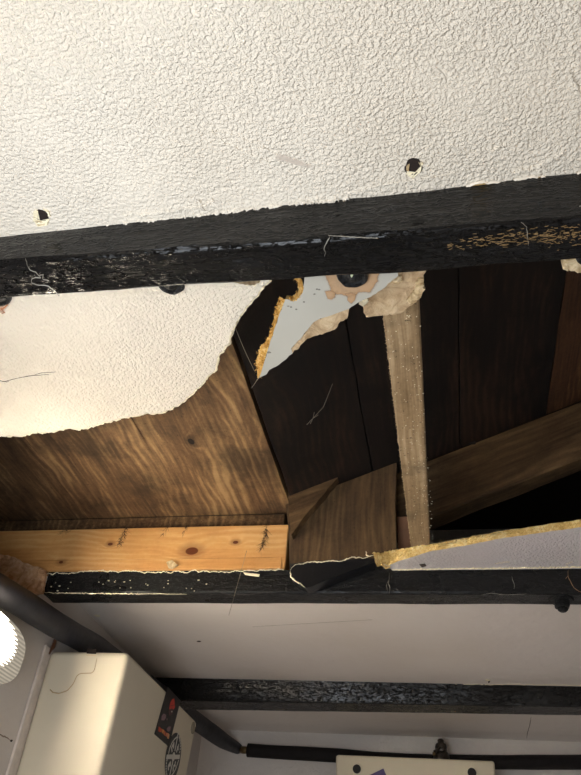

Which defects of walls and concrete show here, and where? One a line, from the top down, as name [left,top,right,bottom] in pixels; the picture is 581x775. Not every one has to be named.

peeling [407,277,425,305]
spalling [0,554,284,595]